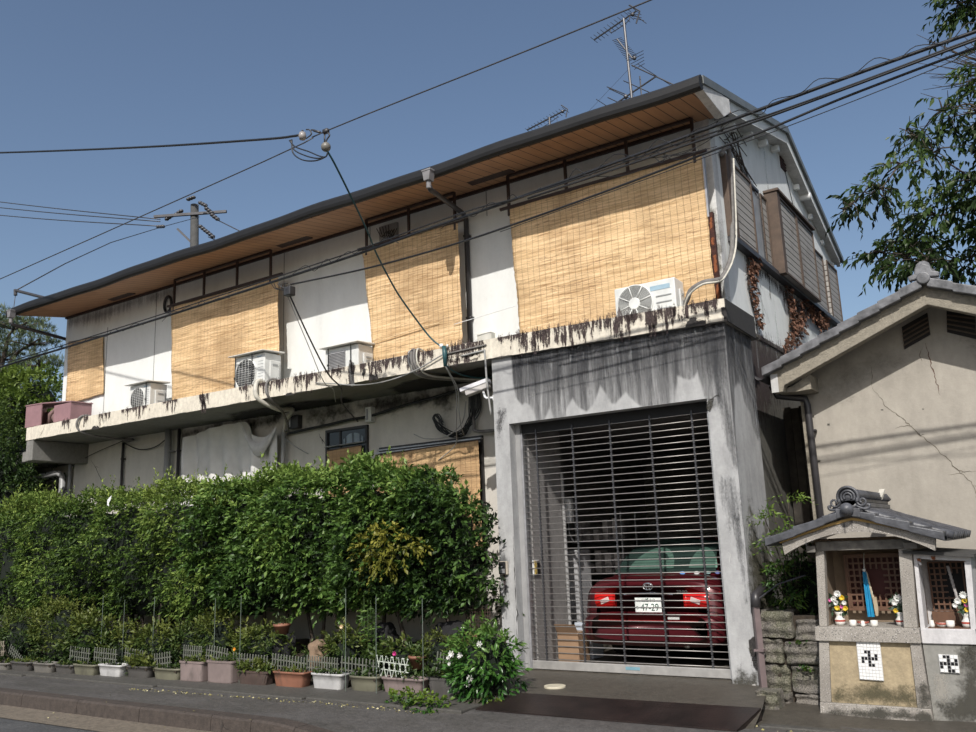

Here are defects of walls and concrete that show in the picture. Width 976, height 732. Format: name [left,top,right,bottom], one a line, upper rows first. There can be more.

water stain [512,322,792,431]
crack [871,367,976,493]